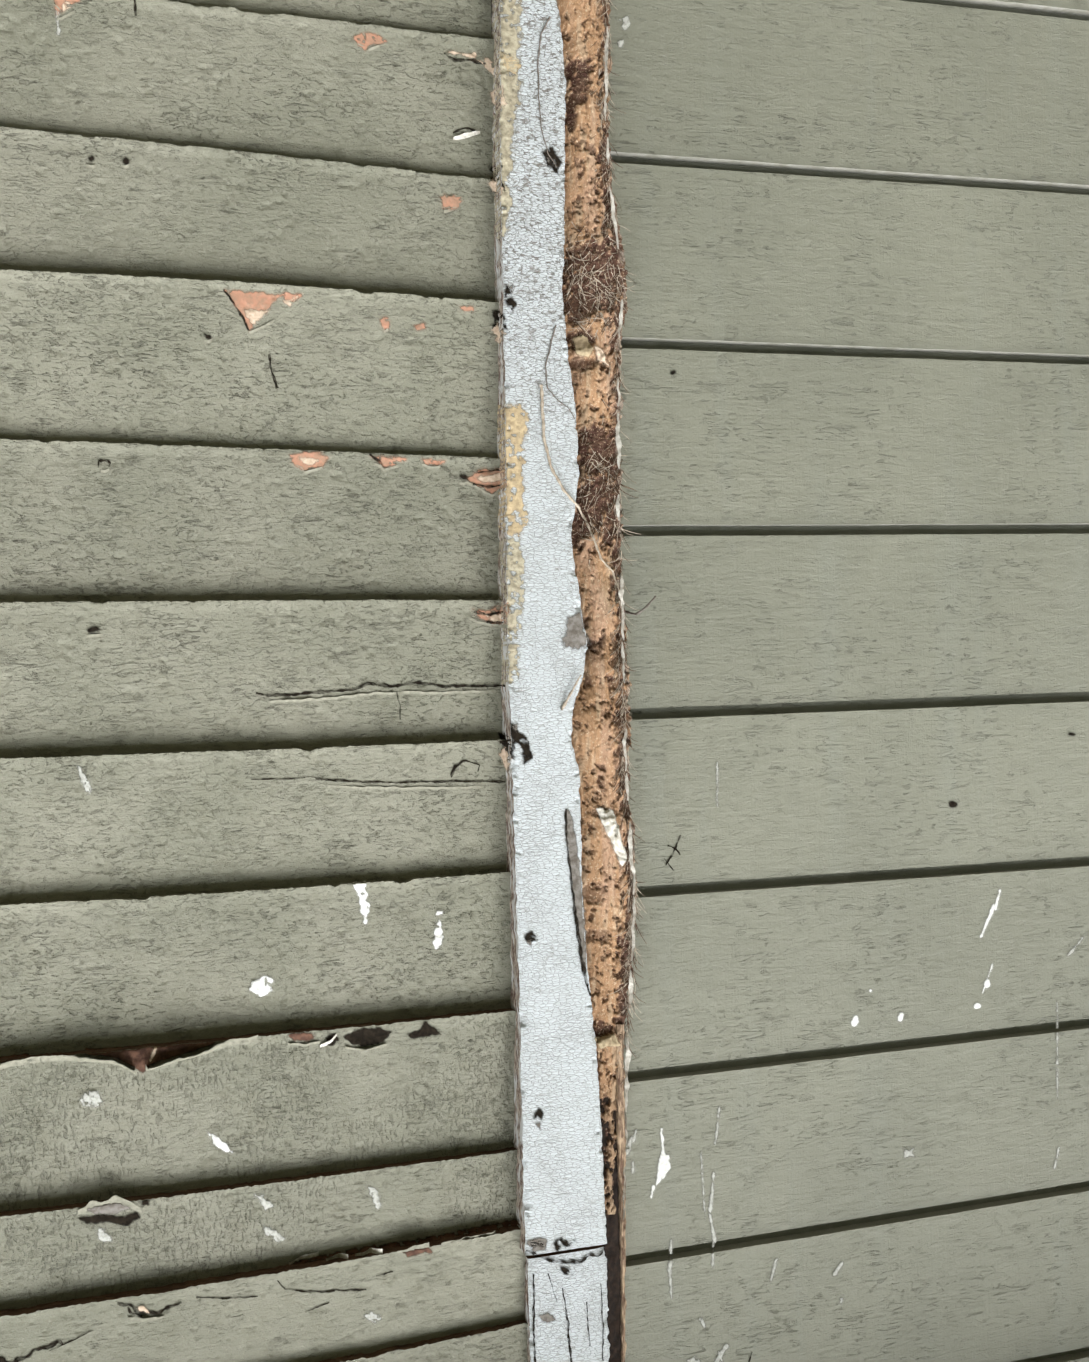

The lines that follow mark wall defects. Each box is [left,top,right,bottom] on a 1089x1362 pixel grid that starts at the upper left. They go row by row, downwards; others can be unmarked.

peeling [223,290,302,334]
peeling [289,451,328,474]
peeling [459,404,529,685]
crack [256,681,505,720]
crack [252,760,506,791]
peeling [0,1035,258,1074]
hole [288,1027,391,1051]
hole [408,1021,440,1039]
peeling [78,1195,149,1226]
crack [196,1271,393,1311]
crack [532,1273,604,1362]
peeling [0,1330,94,1362]